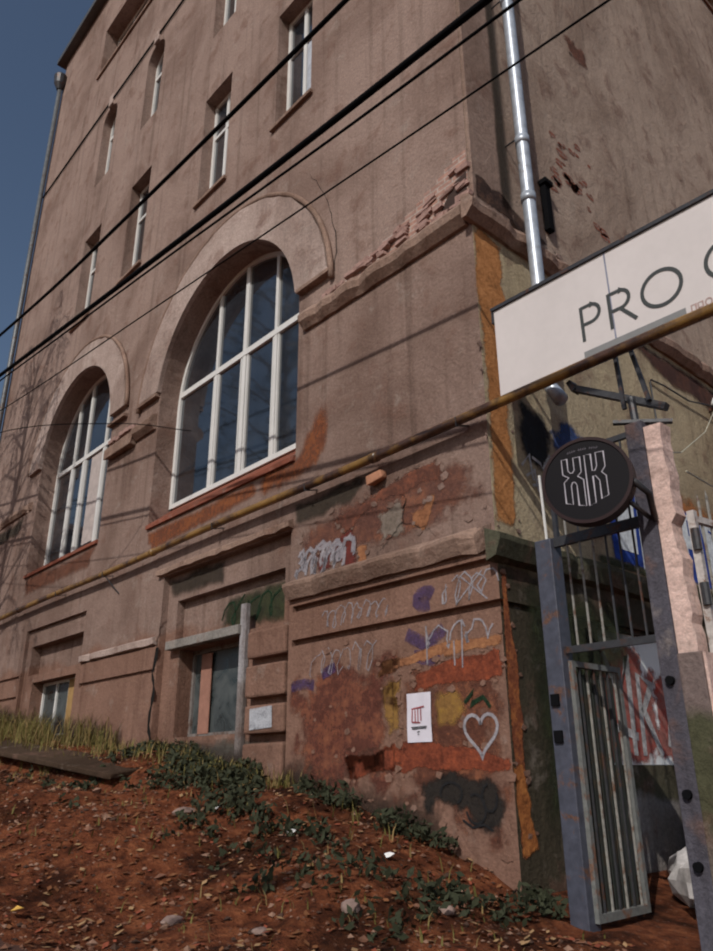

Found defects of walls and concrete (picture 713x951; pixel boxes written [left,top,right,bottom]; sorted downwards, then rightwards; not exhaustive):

peeling [345,150,525,282]
flaking render [549,130,610,243]
flaking render [464,228,521,534]
flaking render [294,459,480,571]
damp [274,766,505,842]